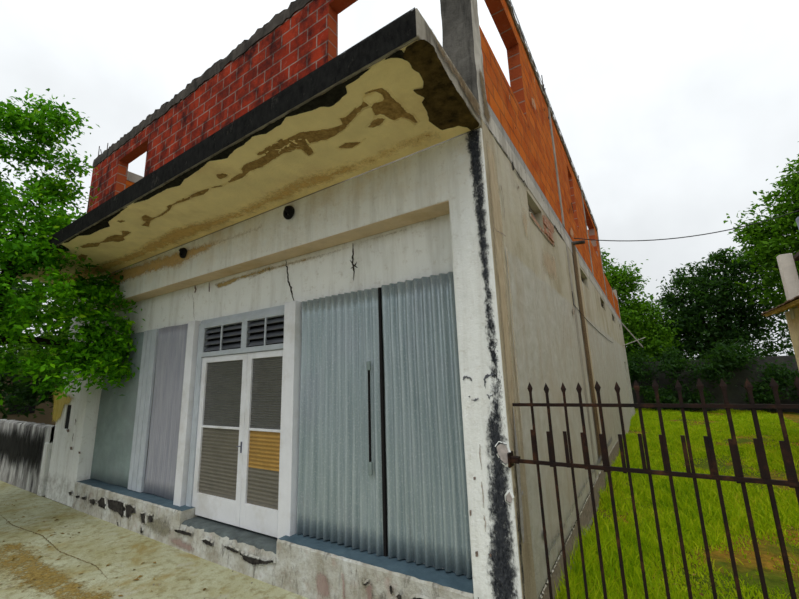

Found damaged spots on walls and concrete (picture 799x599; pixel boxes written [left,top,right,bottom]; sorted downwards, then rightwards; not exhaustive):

peeling [140,86,420,227]
peeling [77,219,131,261]
spalling [529,212,555,247]
crack [350,248,358,281]
damp [43,7,525,599]
spalling [68,491,153,534]
spalling [201,538,276,566]
spalling [389,586,445,599]